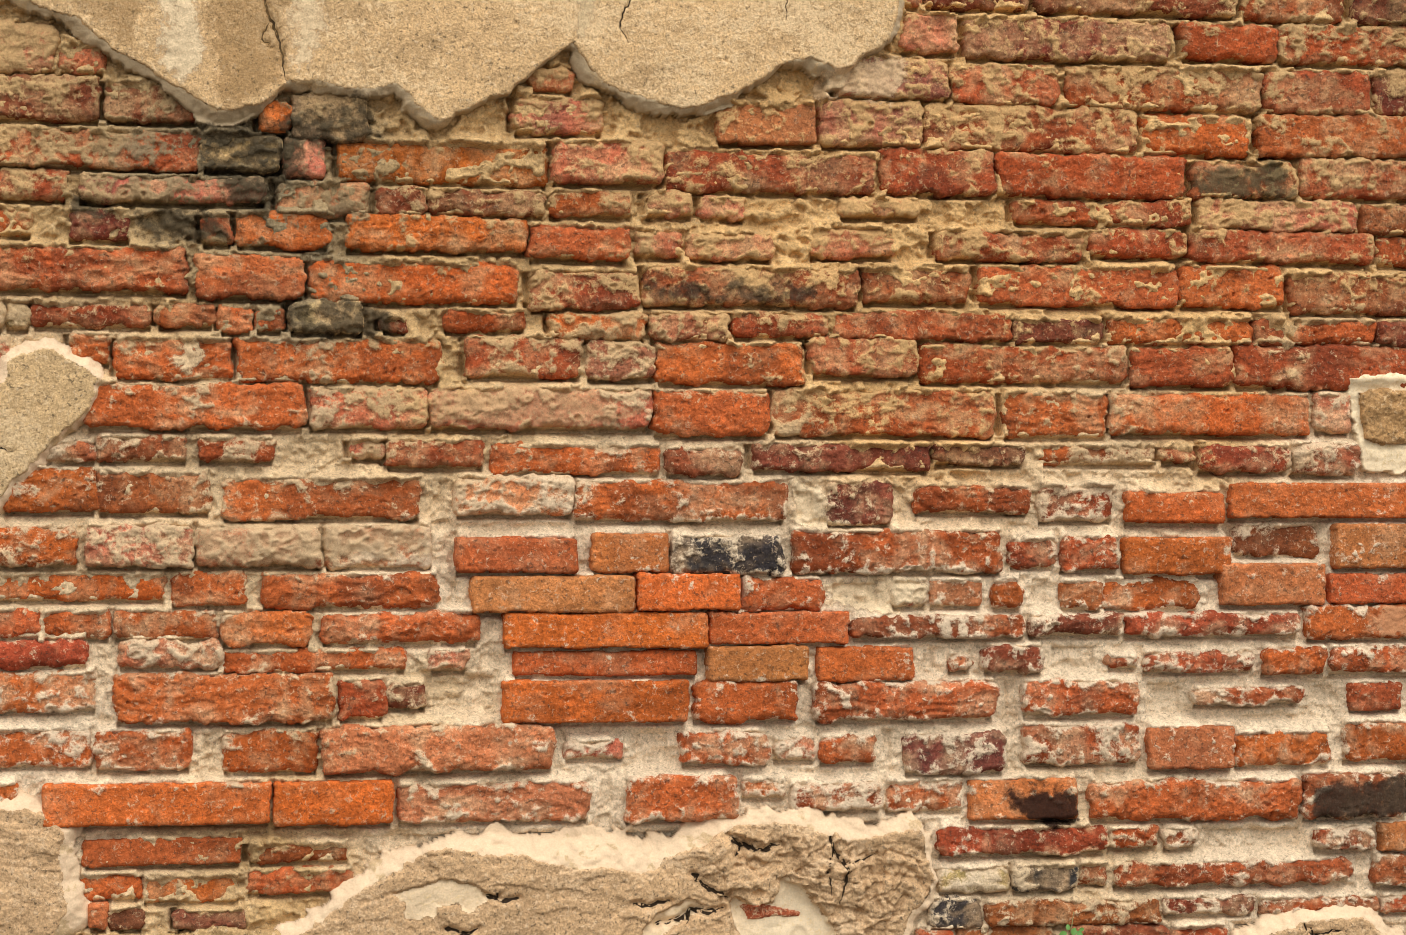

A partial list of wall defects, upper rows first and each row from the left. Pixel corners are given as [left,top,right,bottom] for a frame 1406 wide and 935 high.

crack [261,0,287,81]
flaking render [7,0,905,133]
flaking render [0,336,104,514]
flaking render [0,791,135,935]
crack [445,893,519,935]
flaking render [160,804,938,935]
crack [633,873,727,925]
crack [729,837,780,856]
crack [827,836,875,904]
flaking render [1230,904,1404,935]